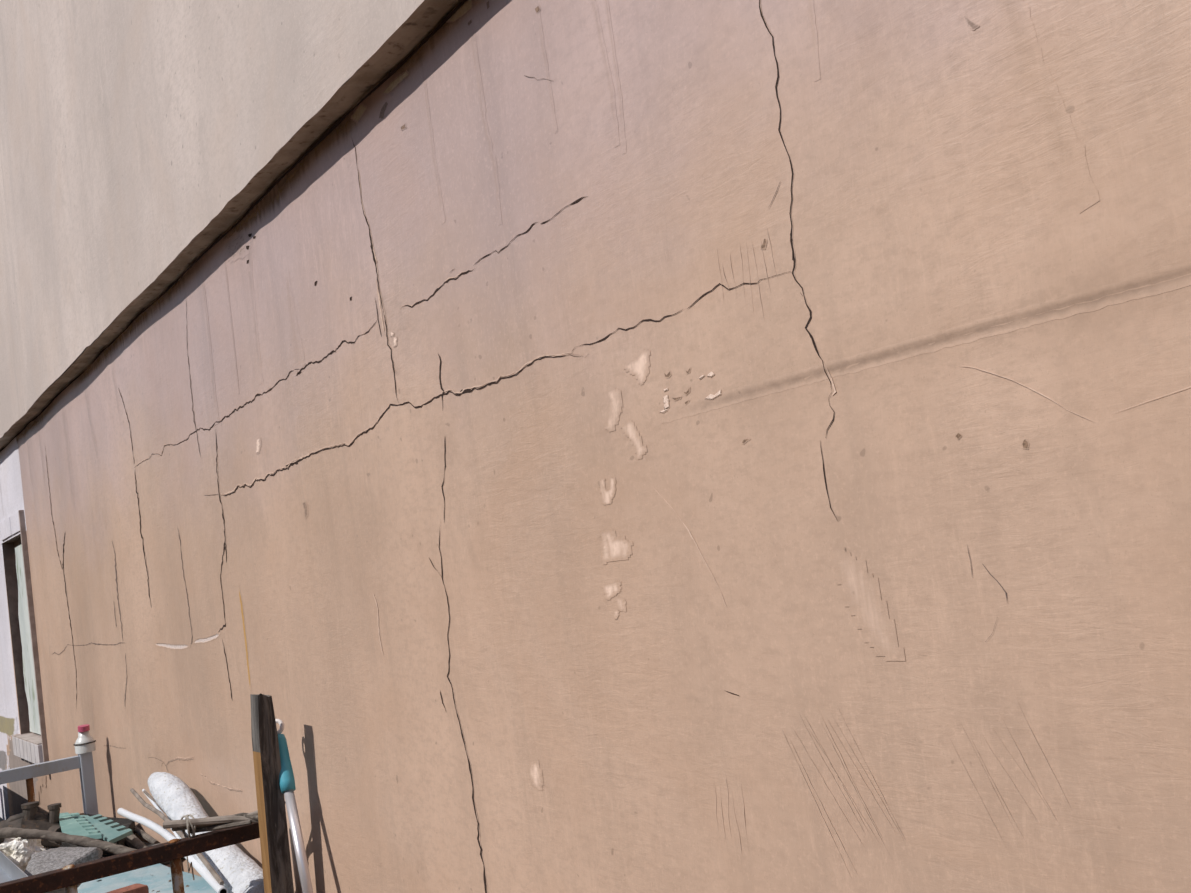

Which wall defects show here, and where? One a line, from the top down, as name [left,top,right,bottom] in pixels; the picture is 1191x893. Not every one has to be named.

crack [0,0,836,709]
peeling [623,349,650,385]
peeling [598,477,616,505]
peeling [598,528,633,565]
crack [429,439,487,893]